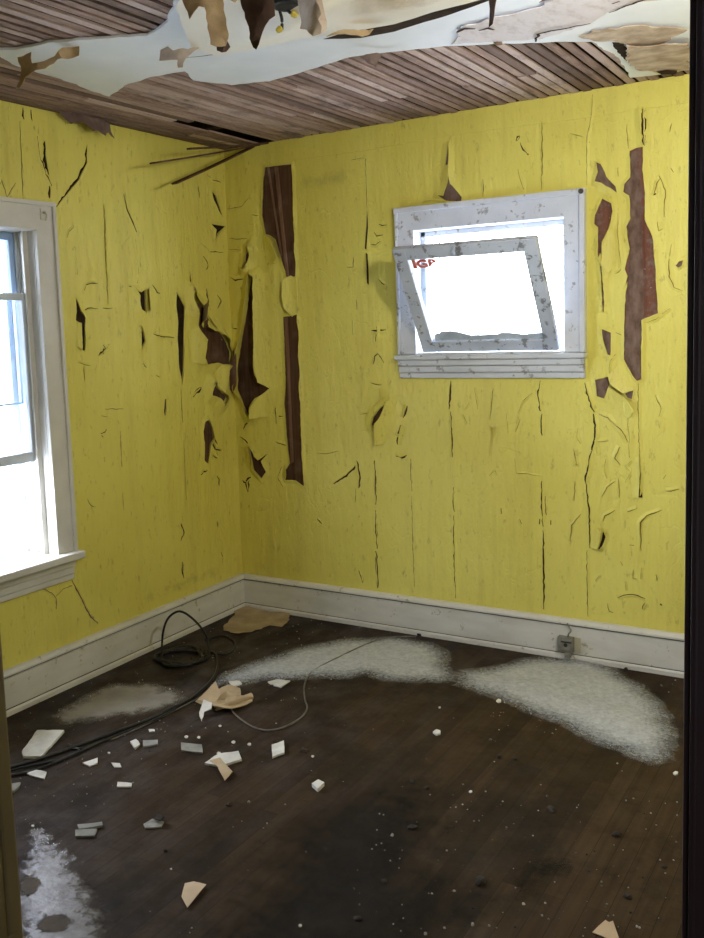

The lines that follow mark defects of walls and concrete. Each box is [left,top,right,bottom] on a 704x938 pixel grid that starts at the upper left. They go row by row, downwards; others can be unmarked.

spalling [325,0,489,39]
spalling [612,42,627,61]
peeling [590,106,663,418]
peeling [672,258,687,271]
peeling [69,291,90,356]
peeling [131,283,153,355]
peeling [172,161,307,490]
crack [35,579,99,623]